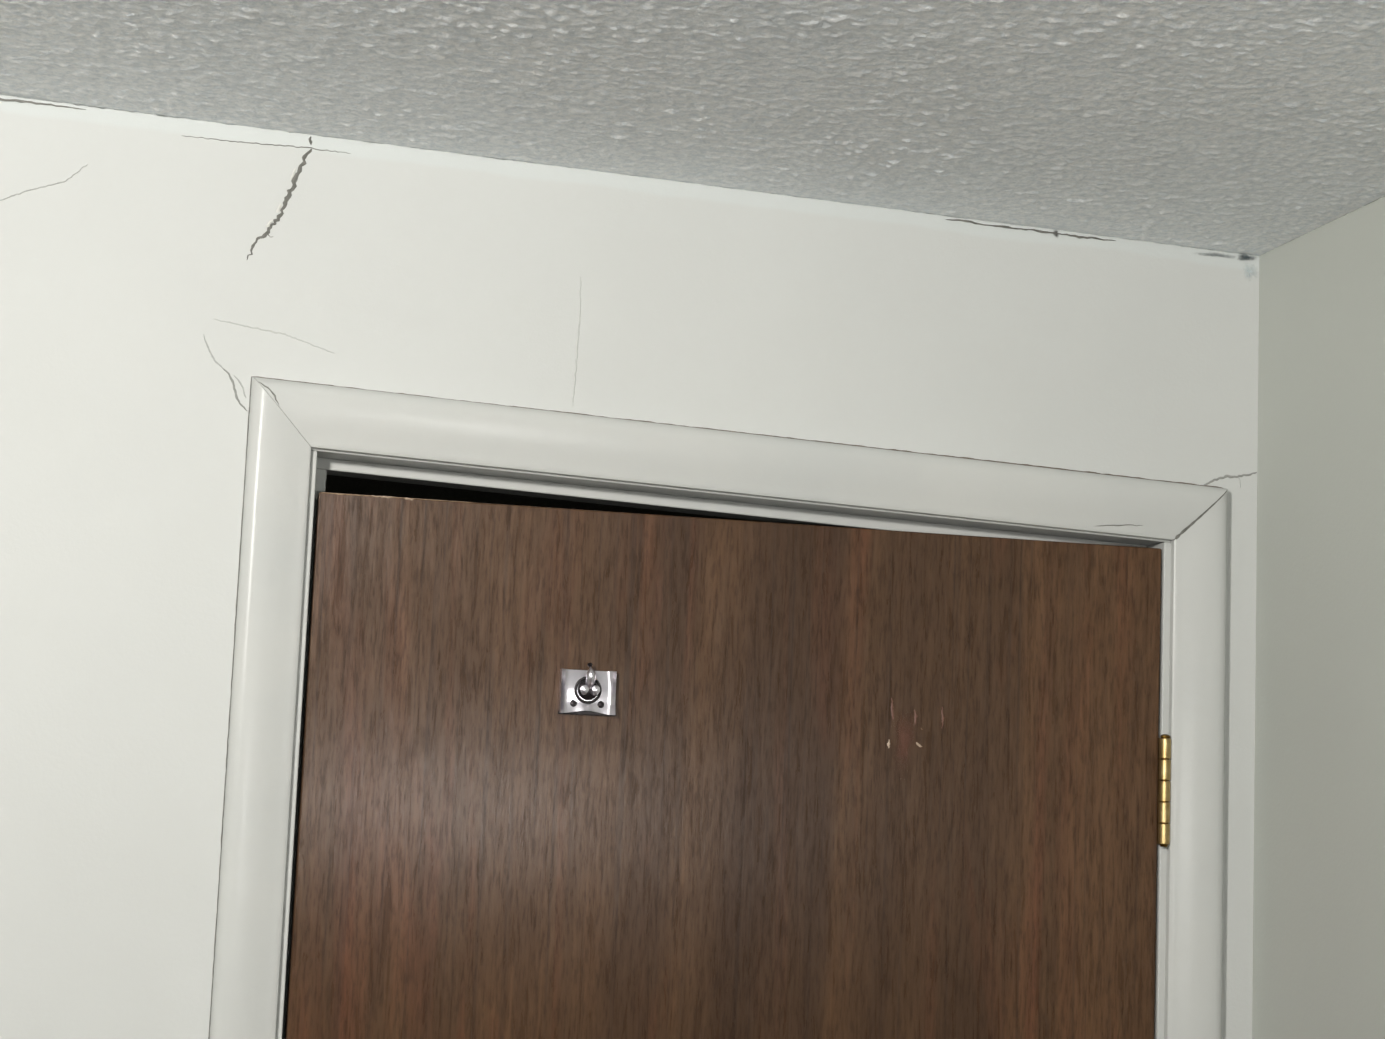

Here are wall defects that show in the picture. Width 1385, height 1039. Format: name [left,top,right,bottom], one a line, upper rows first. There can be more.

crack [185,136,351,259]